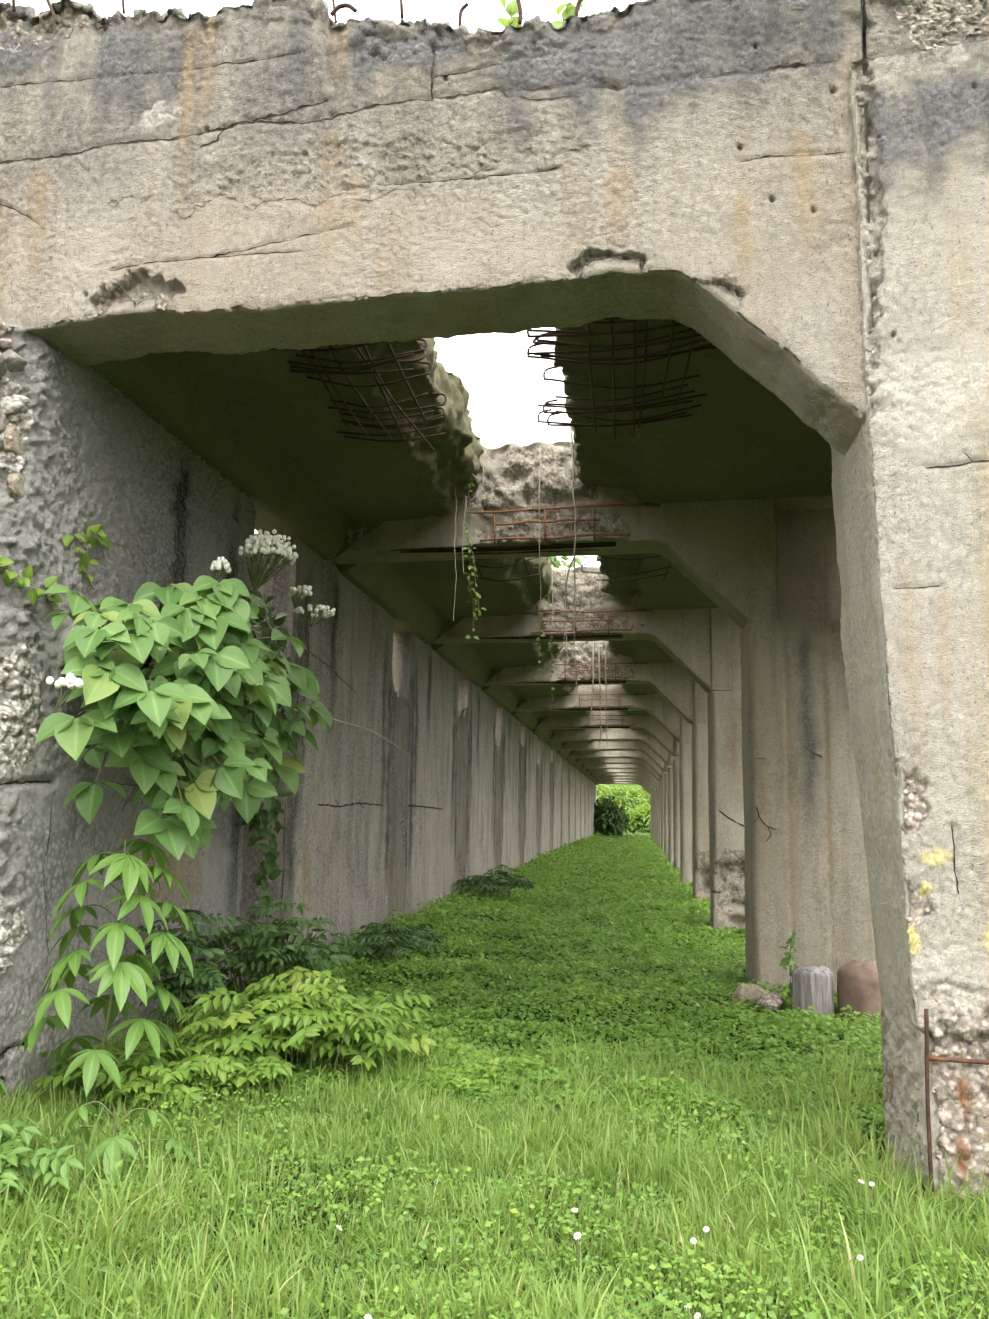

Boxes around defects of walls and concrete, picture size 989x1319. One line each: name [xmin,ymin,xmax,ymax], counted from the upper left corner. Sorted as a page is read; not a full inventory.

spalling [0,0,109,52]
spalling [890,0,989,51]
crack [0,47,842,164]
water stain [869,75,989,173]
crack [112,226,349,271]
spalling [572,254,645,277]
spalling [896,775,927,834]
spalling [912,979,989,1211]
rust [955,1079,969,1123]
rust [955,1138,969,1180]